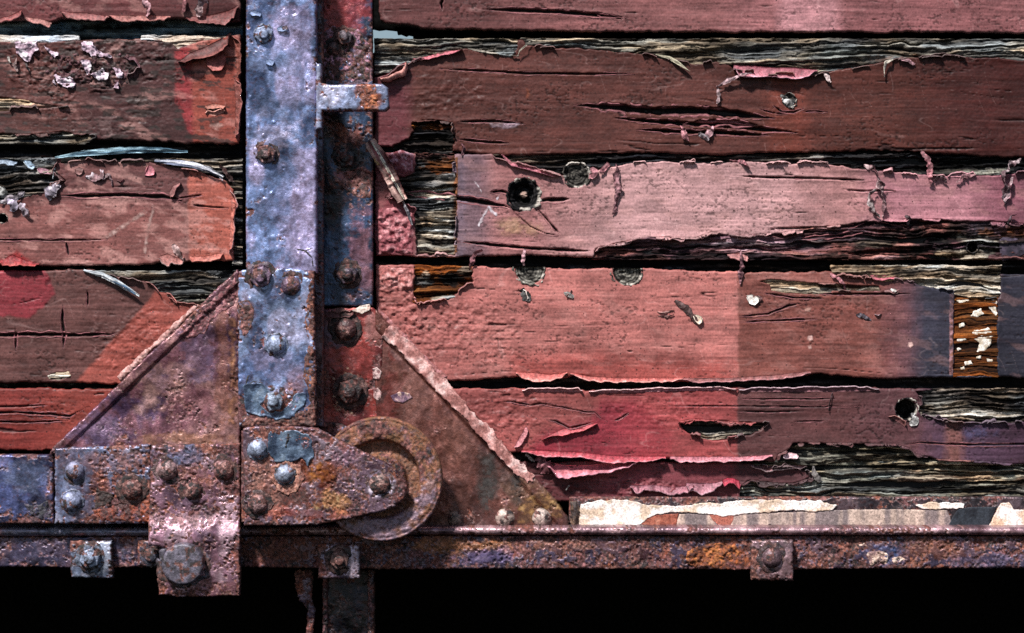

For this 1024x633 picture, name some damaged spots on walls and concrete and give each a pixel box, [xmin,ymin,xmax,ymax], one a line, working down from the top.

peeling [0,10,141,89]
corrosion [324,26,378,111]
peeling [374,38,1024,104]
crack [573,101,828,138]
peeling [0,132,243,305]
crack [404,189,583,252]
peeling [493,150,1024,427]
corrosion [179,278,317,427]
peeling [382,326,1024,525]
corrosion [92,495,150,523]
corrosion [517,494,580,525]
corrosion [686,543,740,569]